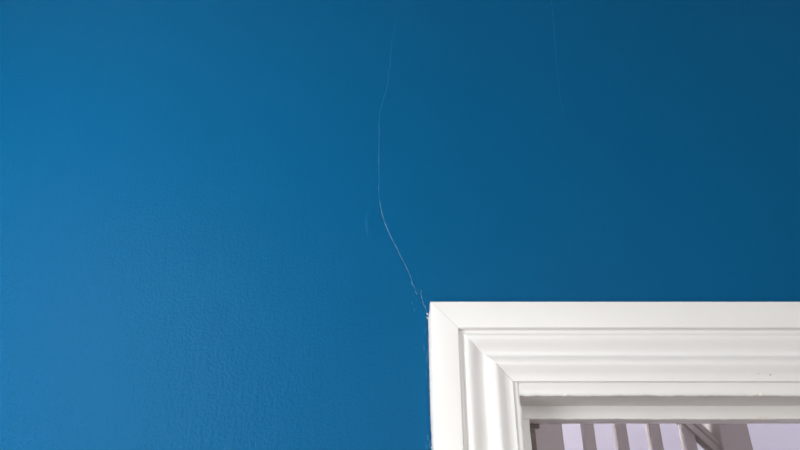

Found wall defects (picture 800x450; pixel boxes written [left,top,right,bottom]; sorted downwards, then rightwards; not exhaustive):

crack [378,19,456,325]